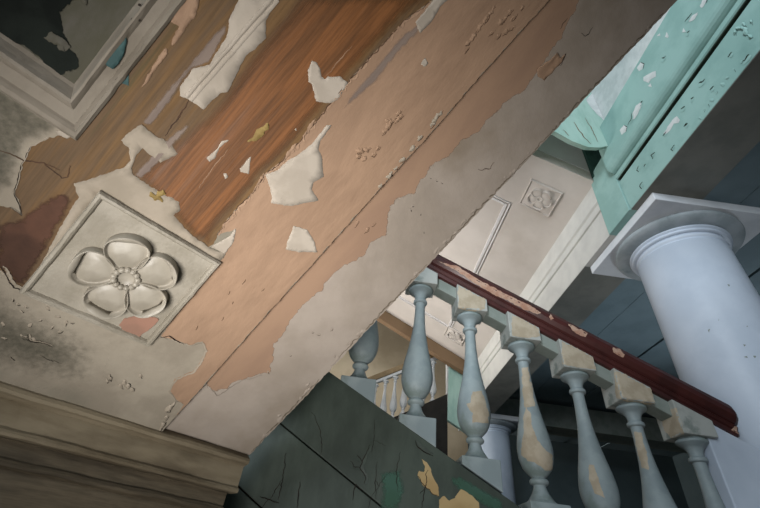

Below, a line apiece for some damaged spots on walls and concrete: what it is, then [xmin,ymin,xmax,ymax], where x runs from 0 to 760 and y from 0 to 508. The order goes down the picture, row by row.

peeling [637,62,656,87]
peeling [577,94,604,120]
crack [2,151,70,179]
peeling [0,0,579,431]
peeling [561,341,596,370]
peeling [614,369,655,405]
peeling [521,367,553,471]
peeling [418,459,479,508]